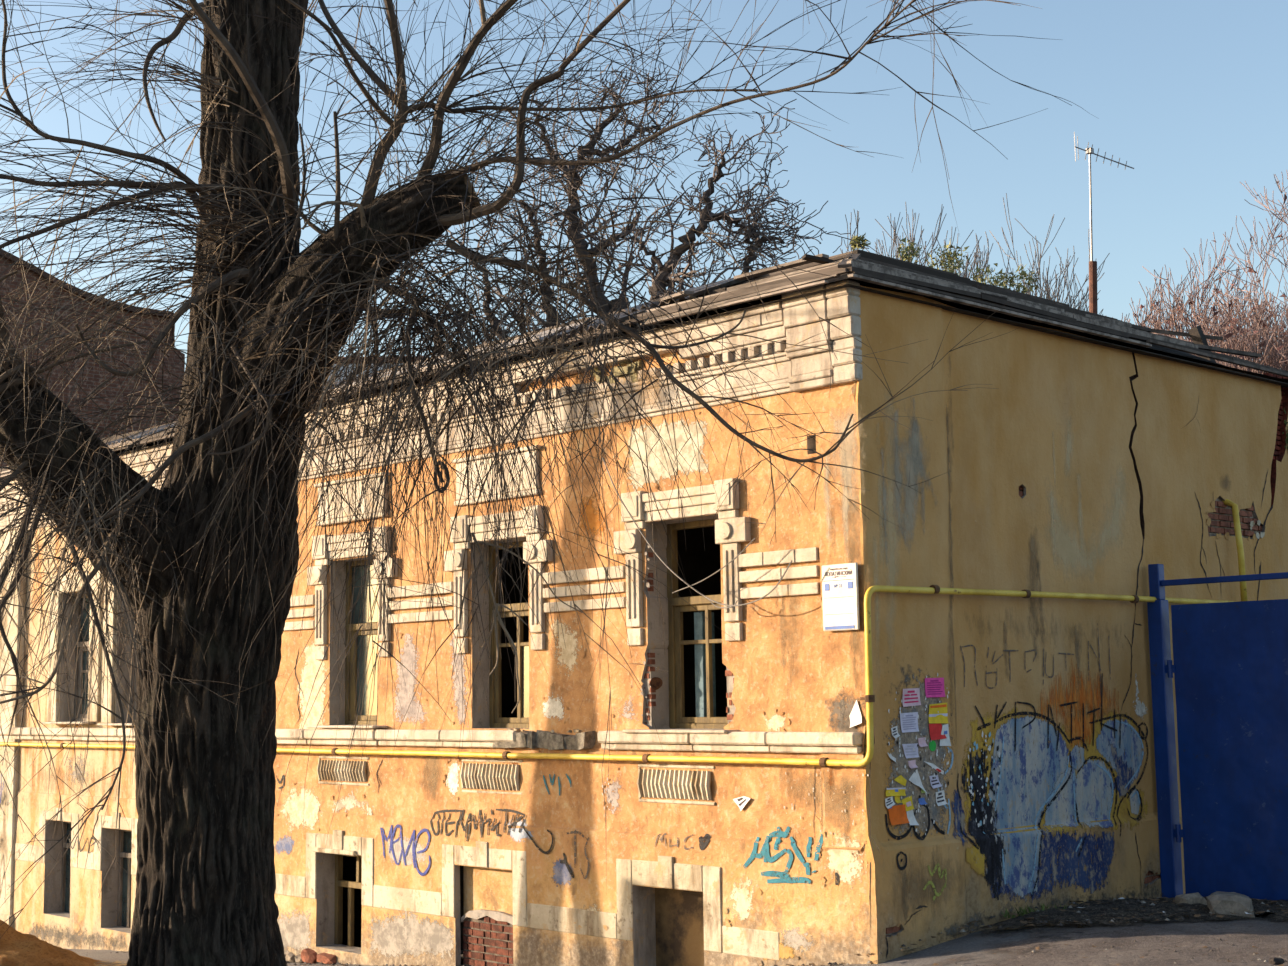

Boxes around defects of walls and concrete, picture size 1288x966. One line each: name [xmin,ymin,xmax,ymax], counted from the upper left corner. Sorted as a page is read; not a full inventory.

peeling [621,412,708,493]
crack [1195,494,1224,594]
flaking render [1206,498,1265,540]
crack [1254,373,1288,601]
peeling [393,633,427,730]
peeling [540,692,568,724]
peeling [551,615,586,677]
flaking render [610,649,669,727]
flaking render [725,667,736,724]
crack [1121,539,1144,711]
peeling [277,782,375,839]
peeling [816,831,868,893]